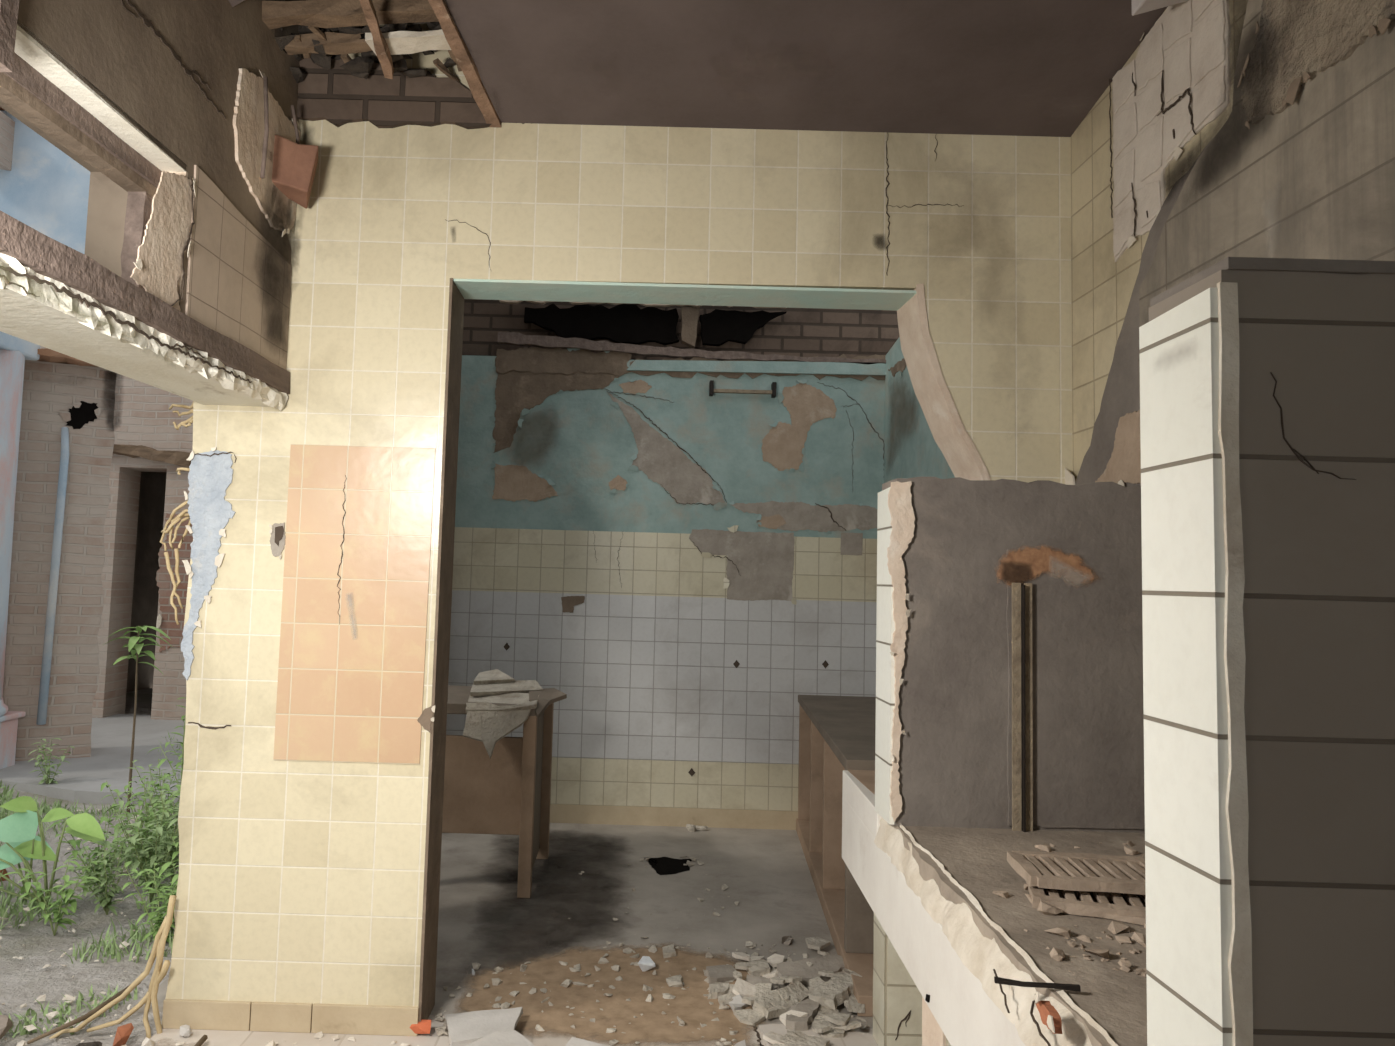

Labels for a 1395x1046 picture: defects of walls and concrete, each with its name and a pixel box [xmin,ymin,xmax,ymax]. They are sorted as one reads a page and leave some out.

crack [171,177,195,307]
crack [885,132,964,274]
crack [1109,70,1196,236]
peeling [1112,0,1395,262]
crack [0,266,252,383]
spalling [1095,410,1141,487]
spalling [156,447,236,680]
crack [337,475,347,625]
flaking render [462,283,1118,1046]
leakage [484,832,622,972]
crack [753,1027,764,1046]
crack [993,969,1051,1046]